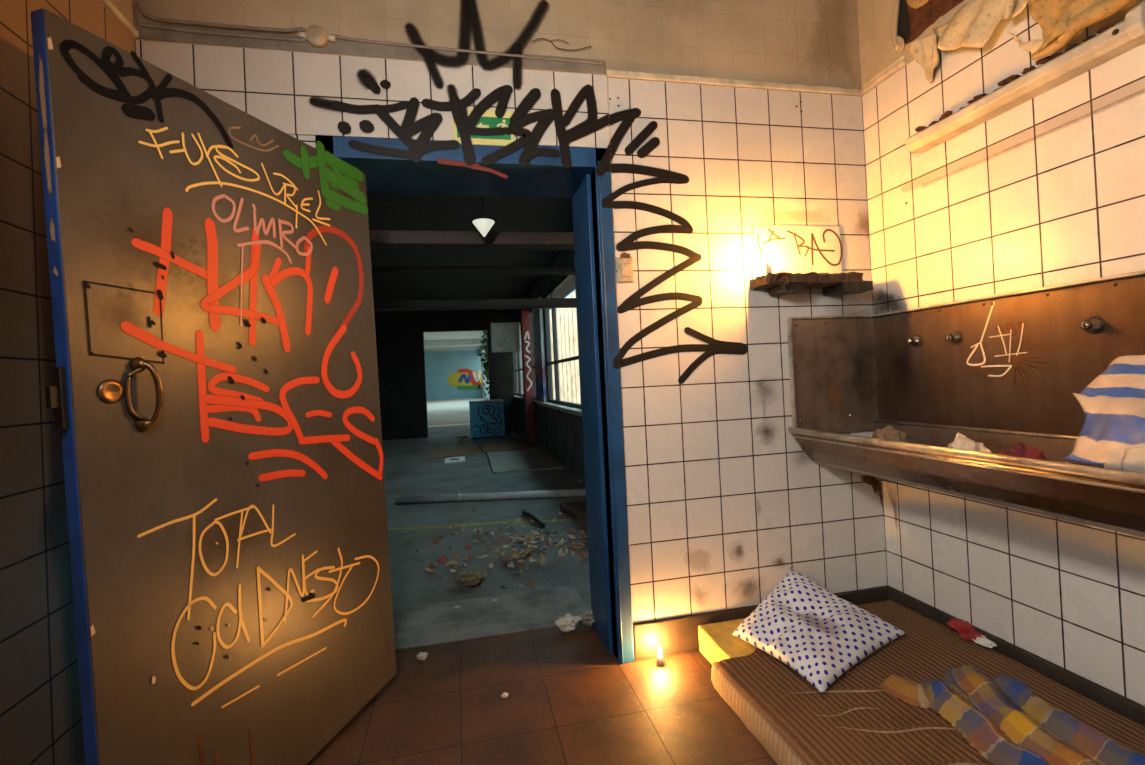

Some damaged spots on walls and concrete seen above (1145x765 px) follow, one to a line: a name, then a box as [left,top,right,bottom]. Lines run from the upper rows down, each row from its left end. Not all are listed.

flaking render [891,0,1135,132]